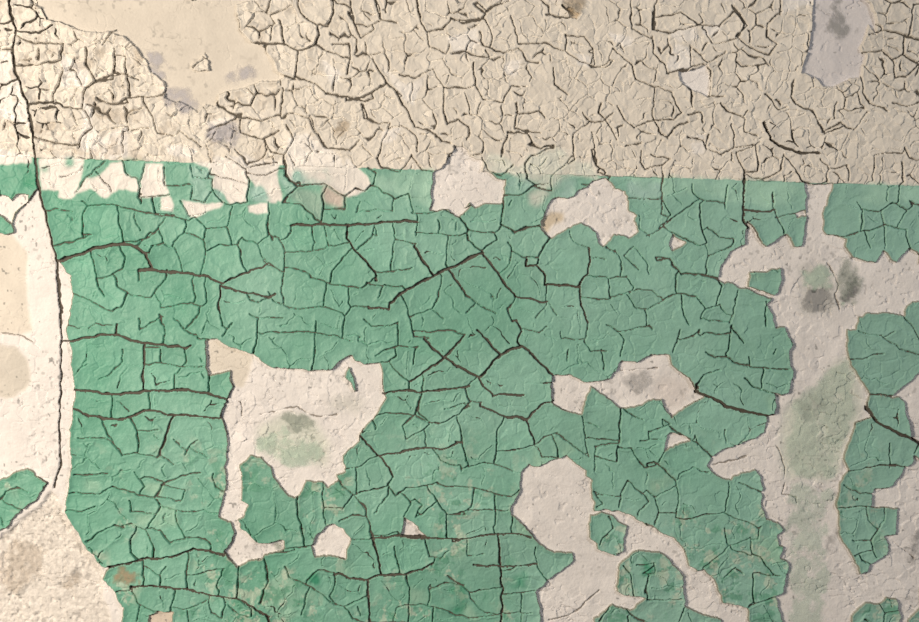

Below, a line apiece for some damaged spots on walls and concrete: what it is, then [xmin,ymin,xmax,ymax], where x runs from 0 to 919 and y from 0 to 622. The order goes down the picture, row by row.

peeling [0,0,17,86]
peeling [10,0,919,282]
crack [762,121,837,167]
crack [0,0,337,492]
peeling [0,80,268,622]
crack [350,428,461,478]
crack [290,217,595,445]
peeling [61,176,919,622]
crack [683,374,797,503]
crack [854,402,919,444]
crack [99,537,284,622]
crack [329,524,538,622]